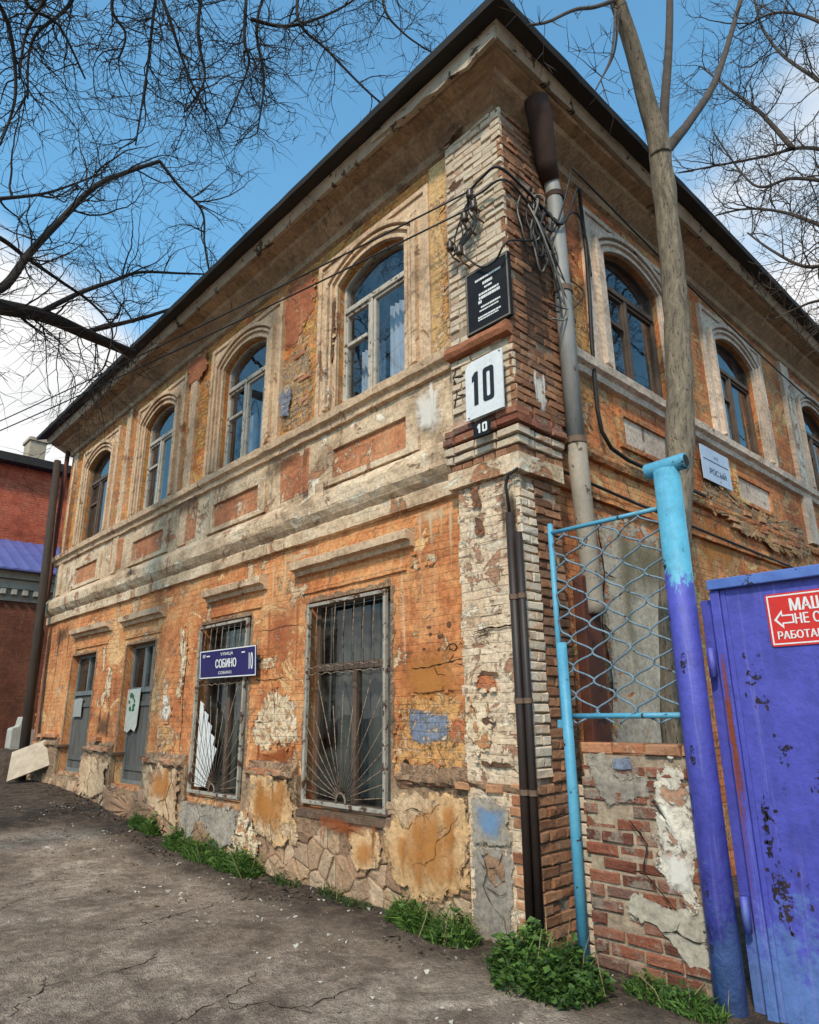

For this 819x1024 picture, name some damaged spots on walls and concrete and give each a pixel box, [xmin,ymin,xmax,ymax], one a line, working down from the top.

spalling [469,486,484,535]
spalling [699,481,812,561]
peeling [99,647,112,710]
flaking render [156,625,188,754]
peeling [250,684,298,752]
flaking render [392,670,515,769]
crack [406,623,511,694]
crack [402,808,459,866]
crack [629,820,707,944]